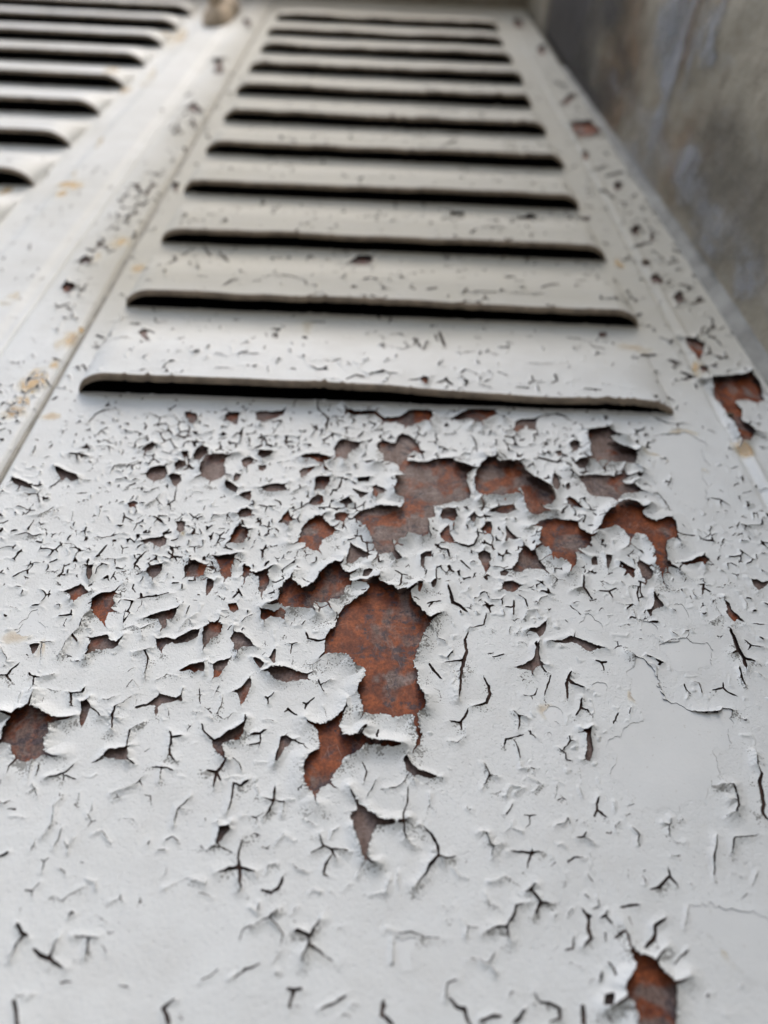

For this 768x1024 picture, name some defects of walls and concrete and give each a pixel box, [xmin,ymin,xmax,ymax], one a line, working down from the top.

crack [0,23,88,67]
peeling [53,278,91,299]
peeling [335,251,384,270]
crack [9,56,768,473]
peeling [5,473,38,491]
peeling [45,461,87,489]
crack [0,307,768,913]
peeling [55,331,768,883]
crack [0,753,124,993]
peeling [0,688,142,786]
crack [141,601,358,1024]
crack [370,655,700,1024]